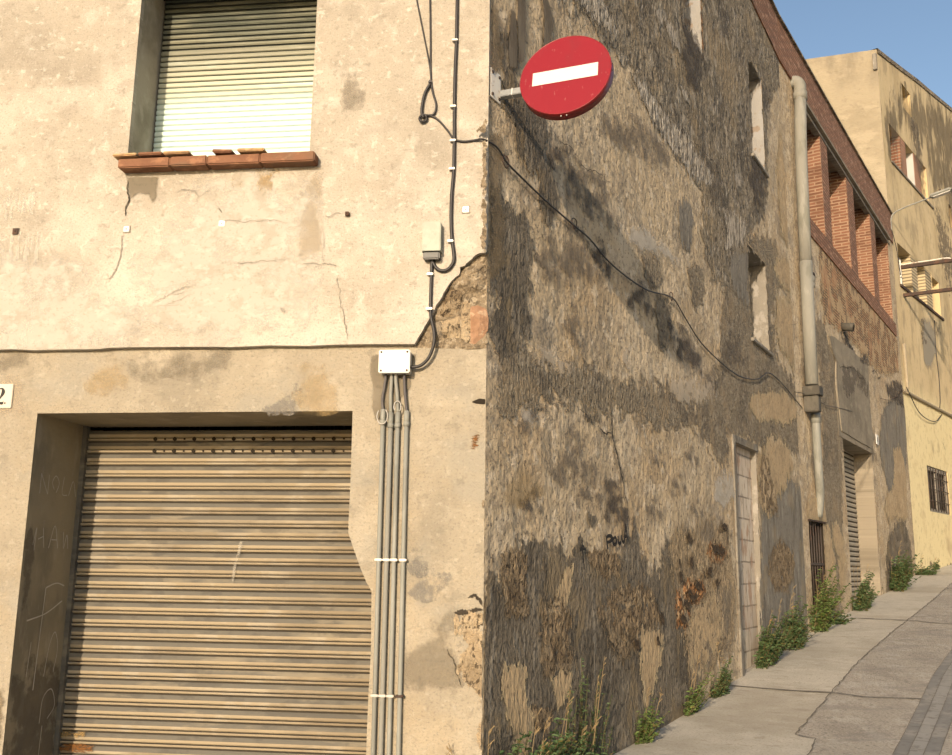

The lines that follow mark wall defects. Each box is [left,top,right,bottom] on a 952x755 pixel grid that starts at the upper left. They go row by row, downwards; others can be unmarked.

peeling [413,0,799,519]
flaking render [453,610,483,703]
flaking render [497,544,529,621]
flaking render [501,563,576,755]
flaking render [586,512,738,708]
flaking render [767,538,795,595]